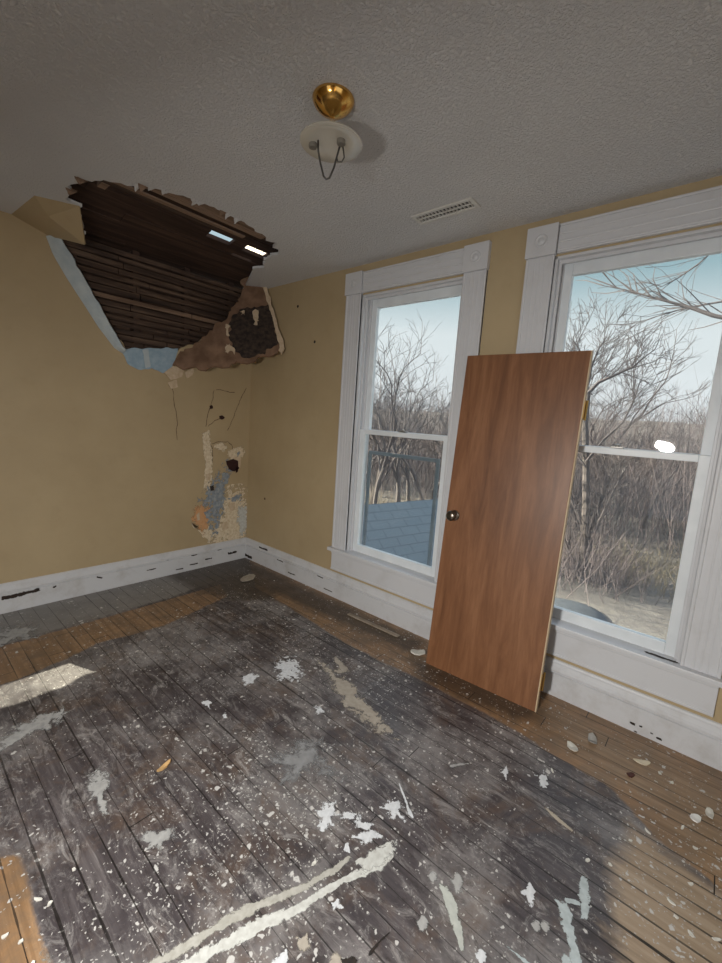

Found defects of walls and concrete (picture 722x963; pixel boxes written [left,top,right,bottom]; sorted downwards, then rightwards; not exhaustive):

flaking render [46,235,194,389]
spalling [241,287,285,355]
peeling [176,430,268,570]